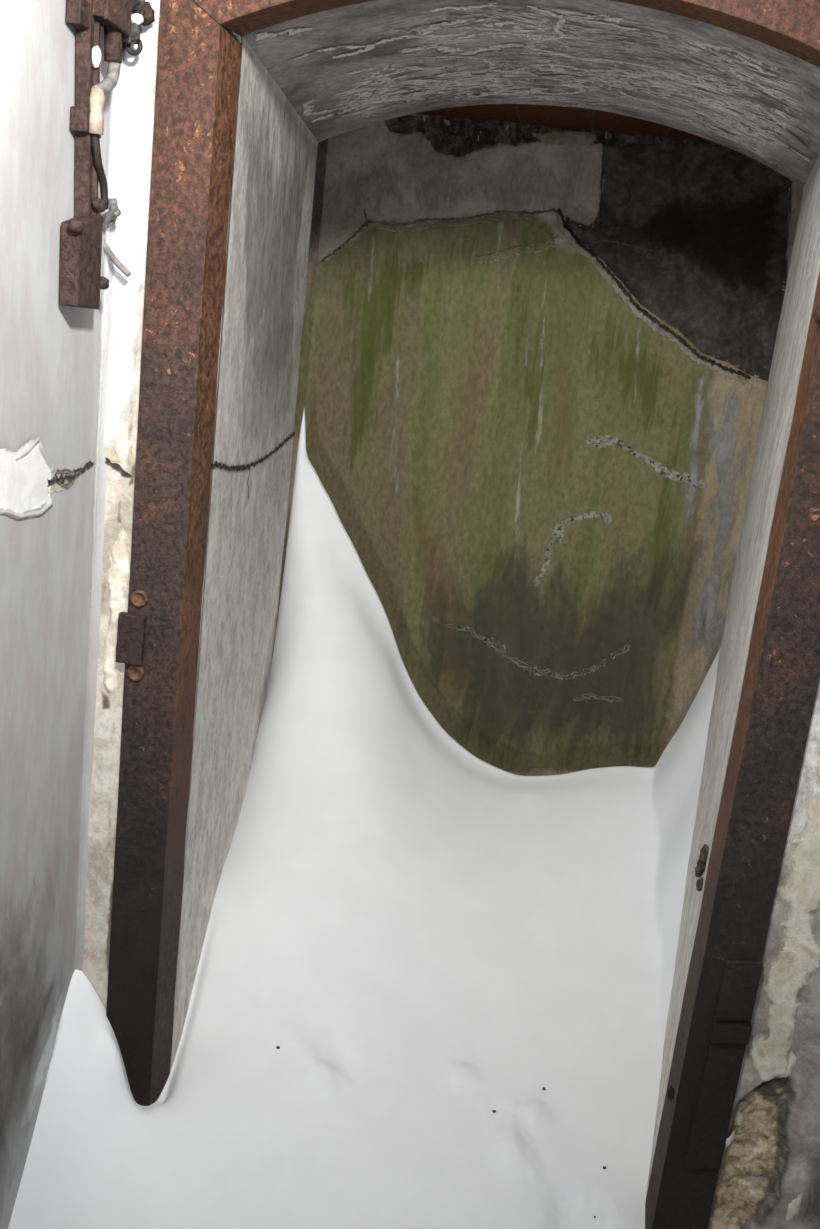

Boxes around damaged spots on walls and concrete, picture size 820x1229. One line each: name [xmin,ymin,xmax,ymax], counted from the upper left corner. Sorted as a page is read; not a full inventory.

leakage [253,28,312,41]
leakage [293,2,810,161]
crack [318,208,751,384]
peeling [0,437,55,520]
crack [47,443,133,494]
crack [211,432,295,498]
leakage [514,391,543,540]
leakage [587,379,746,660]
leakage [432,511,680,749]
peeling [708,732,820,1229]
leakage [0,959,49,1164]